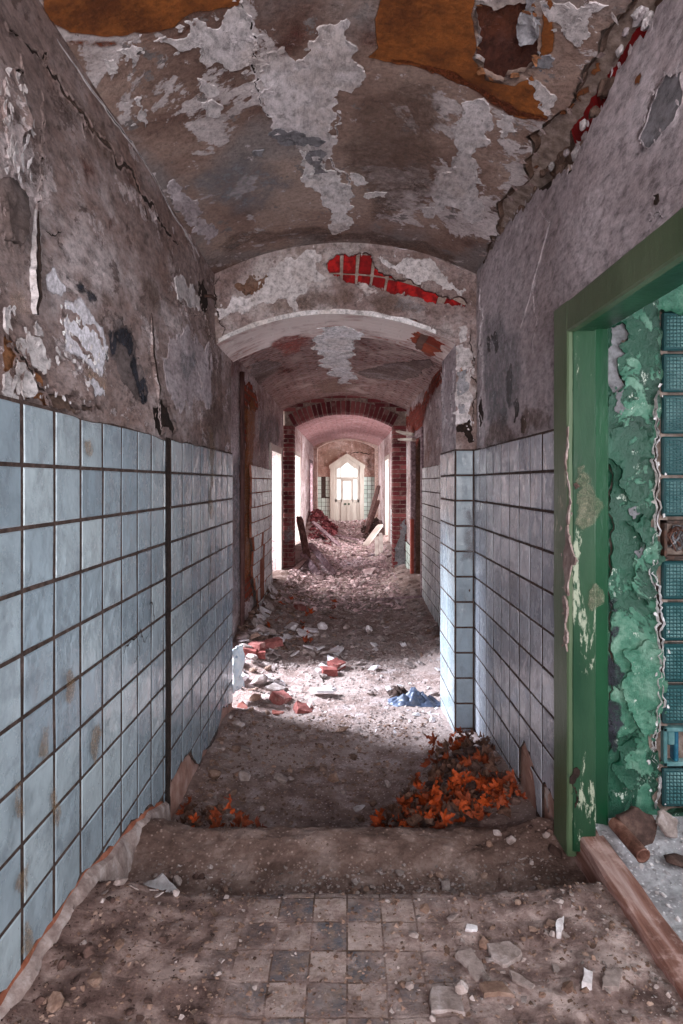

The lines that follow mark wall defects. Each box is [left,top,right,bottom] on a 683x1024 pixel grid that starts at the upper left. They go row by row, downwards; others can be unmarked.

peeling [0,67,36,184]
crack [4,20,200,257]
peeling [154,6,387,235]
peeling [417,98,546,224]
flaking render [476,0,619,116]
peeling [640,70,683,148]
water stain [46,268,148,404]
flaking render [1,209,213,435]
peeling [174,245,466,320]
peeling [311,316,484,443]
peeling [608,323,666,605]
peeling [609,639,668,792]